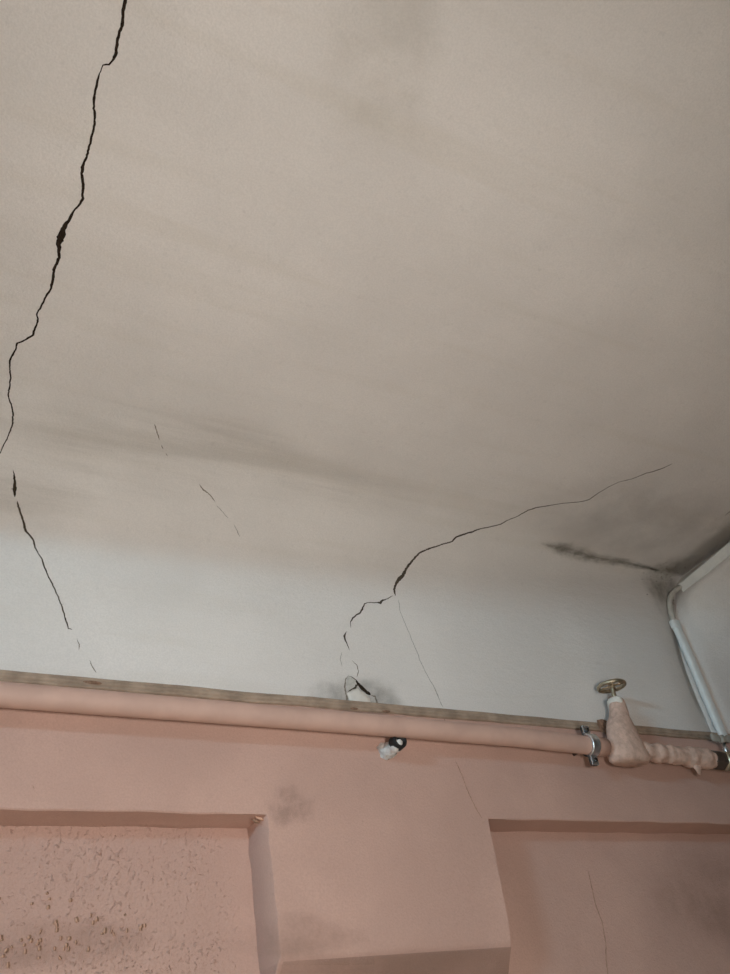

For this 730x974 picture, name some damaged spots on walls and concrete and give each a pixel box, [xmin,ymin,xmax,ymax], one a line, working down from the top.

crack [0,0,127,672]
crack [340,464,671,721]